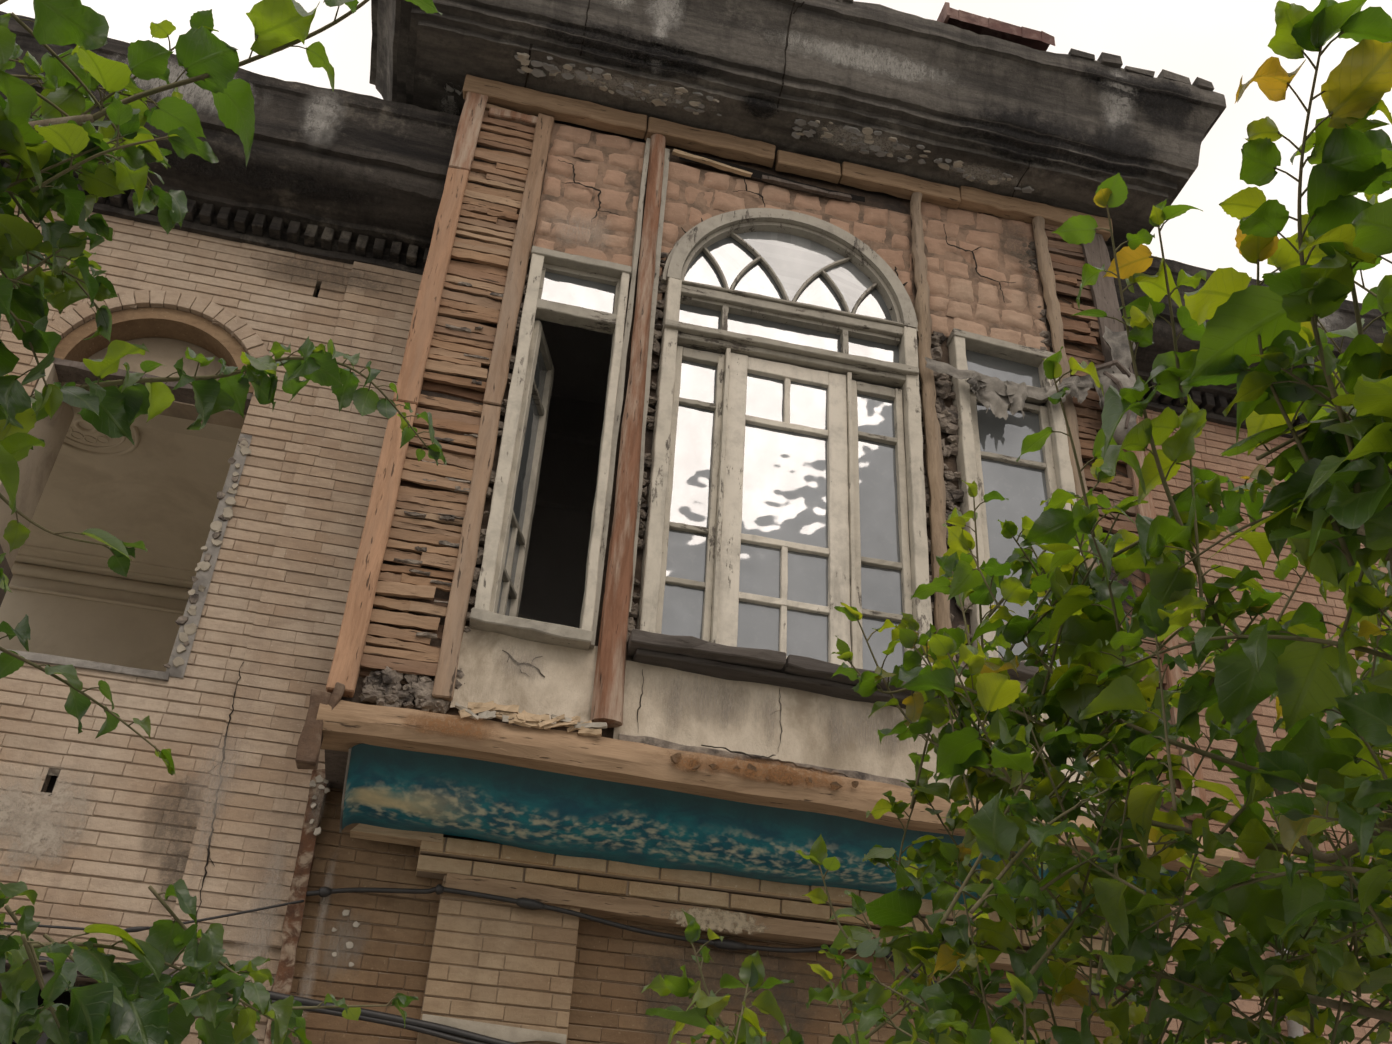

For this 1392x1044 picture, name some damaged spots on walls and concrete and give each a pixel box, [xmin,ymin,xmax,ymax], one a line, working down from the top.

peeling [514,52,721,116]
leakage [636,0,699,77]
crack [777,0,804,112]
crack [558,159,620,222]
peeling [791,119,1034,193]
crack [943,224,1016,303]
crack [502,650,545,678]
crack [701,689,861,780]
crack [196,662,244,925]